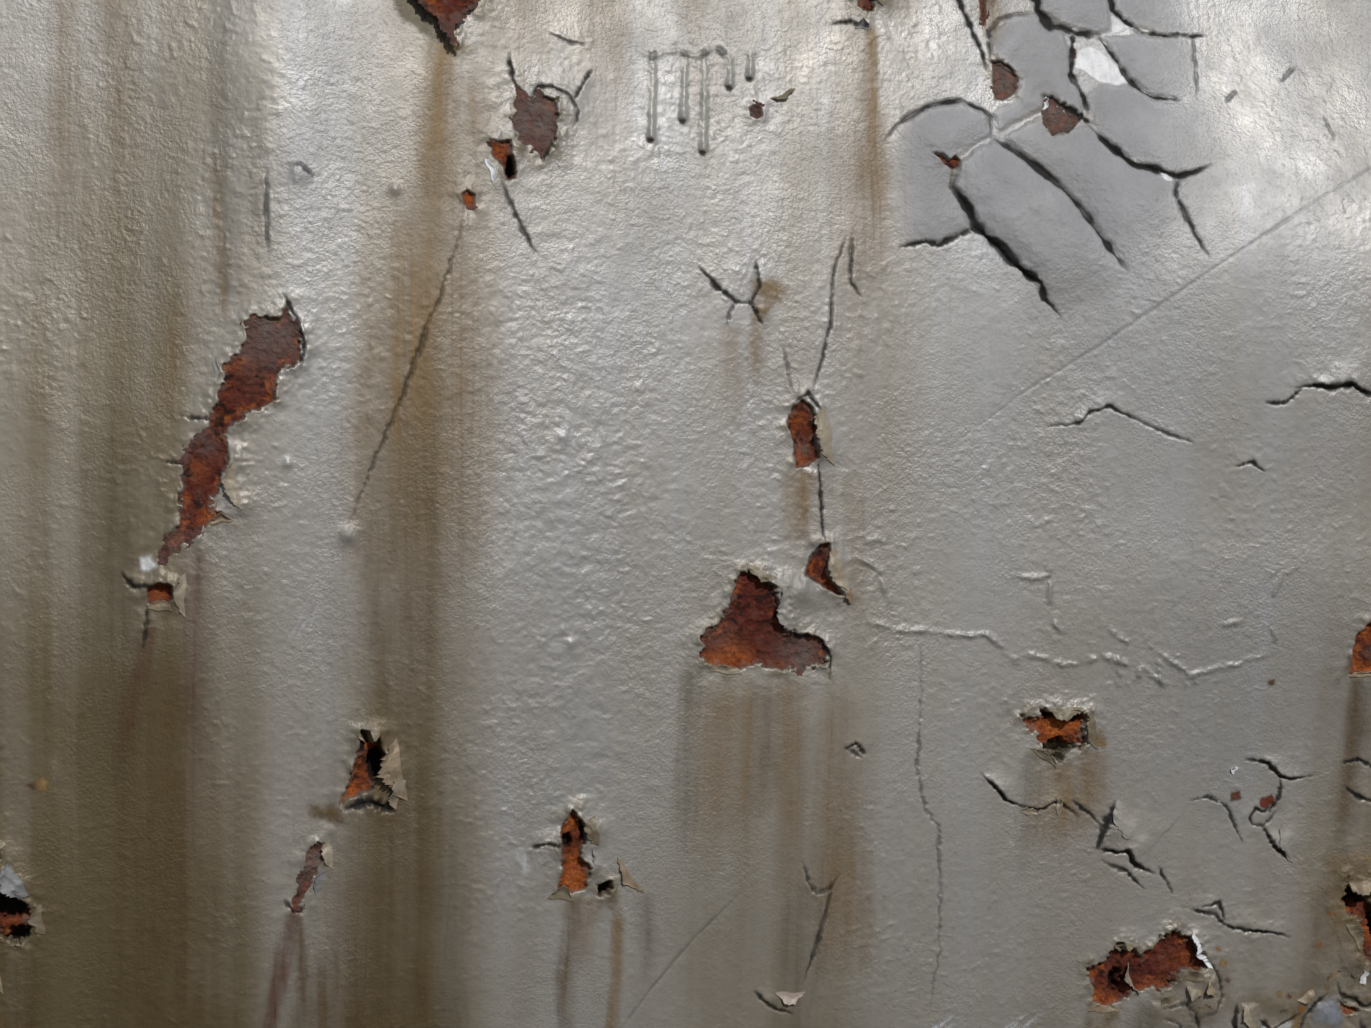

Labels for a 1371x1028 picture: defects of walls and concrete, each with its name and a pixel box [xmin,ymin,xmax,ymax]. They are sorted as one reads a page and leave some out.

peeling [977,0,990,32]
peeling [990,60,1019,100]
peeling [1073,46,1127,85]
peeling [1042,97,1078,136]
crack [701,265,780,323]
crack [1268,381,1371,405]
crack [1075,404,1133,425]
crack [1238,460,1264,471]
crack [1198,758,1305,862]
crack [1075,802,1283,935]
peeling [0,862,45,939]
peeling [1232,881,1371,1028]